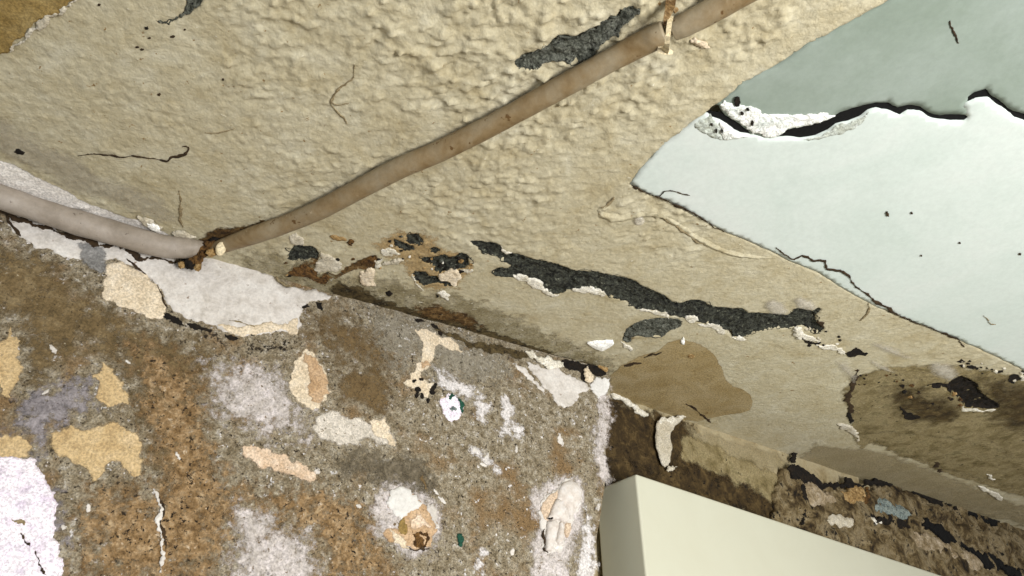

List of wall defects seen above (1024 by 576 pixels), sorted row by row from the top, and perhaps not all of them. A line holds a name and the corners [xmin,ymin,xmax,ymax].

flaking render [515,6,640,70]
crack [330,64,355,124]
crack [78,128,235,162]
peeling [6,214,331,341]
flaking render [285,233,342,274]
peeling [597,197,772,259]
crack [776,247,964,347]
water stain [300,283,778,518]
spalling [383,232,1024,576]
water stain [893,388,958,423]
water stain [986,381,1024,427]
water stain [860,431,1024,490]